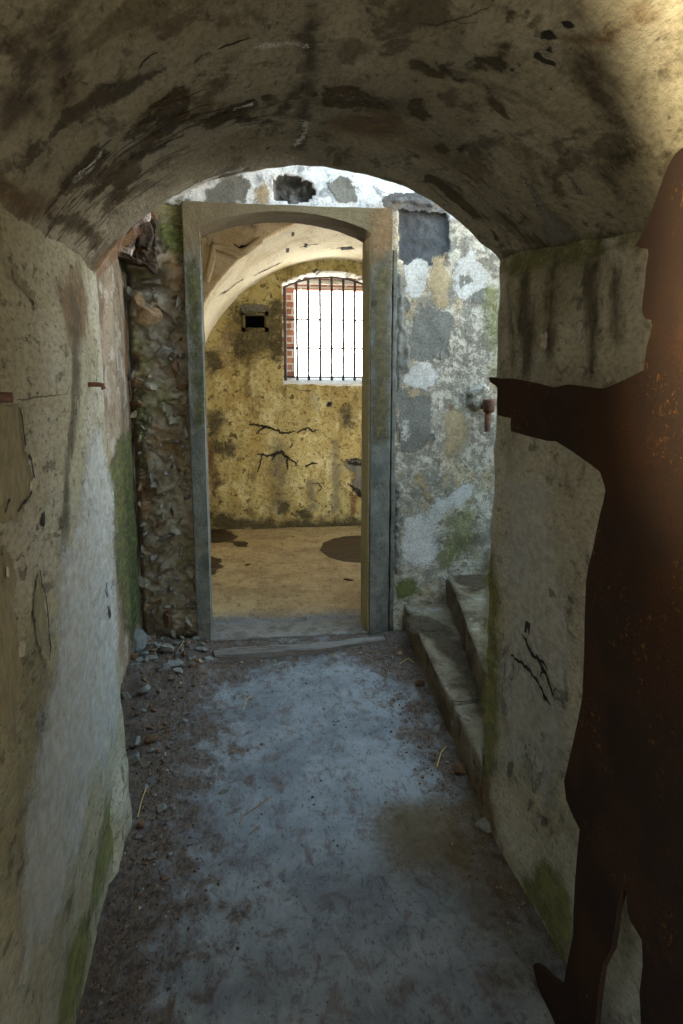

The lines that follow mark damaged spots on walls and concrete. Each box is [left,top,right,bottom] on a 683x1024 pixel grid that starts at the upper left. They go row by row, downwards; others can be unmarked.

spalling [124,205,197,639]
flaking render [32,85,389,265]
crack [249,423,323,493]
spalling [382,172,551,453]
leakage [19,269,118,984]
crack [510,634,553,705]